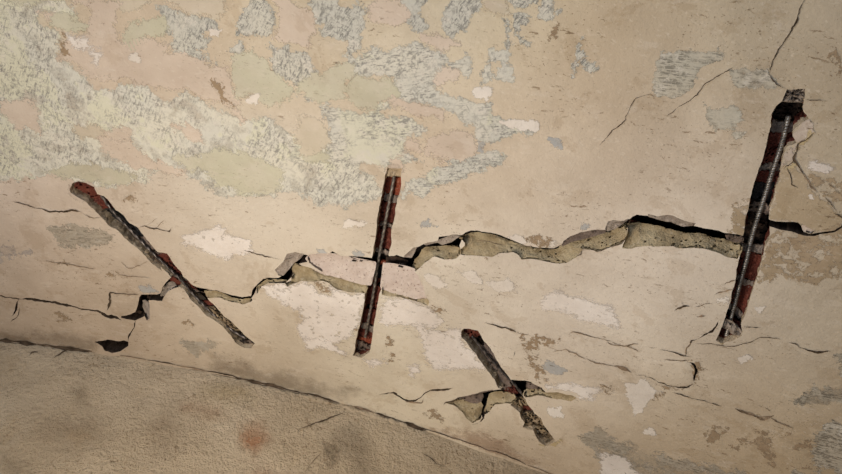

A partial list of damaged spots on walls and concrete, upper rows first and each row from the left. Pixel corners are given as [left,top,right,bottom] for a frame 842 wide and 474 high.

peeling [0,0,563,211]
peeling [652,47,725,99]
crack [15,202,100,219]
crack [195,250,307,299]
flaking render [204,198,750,313]
crack [331,214,744,268]
crack [767,135,842,236]
crack [0,262,550,474]
flaking render [447,333,576,423]
crack [559,280,828,428]
peeling [577,425,747,474]
peeling [791,419,842,474]